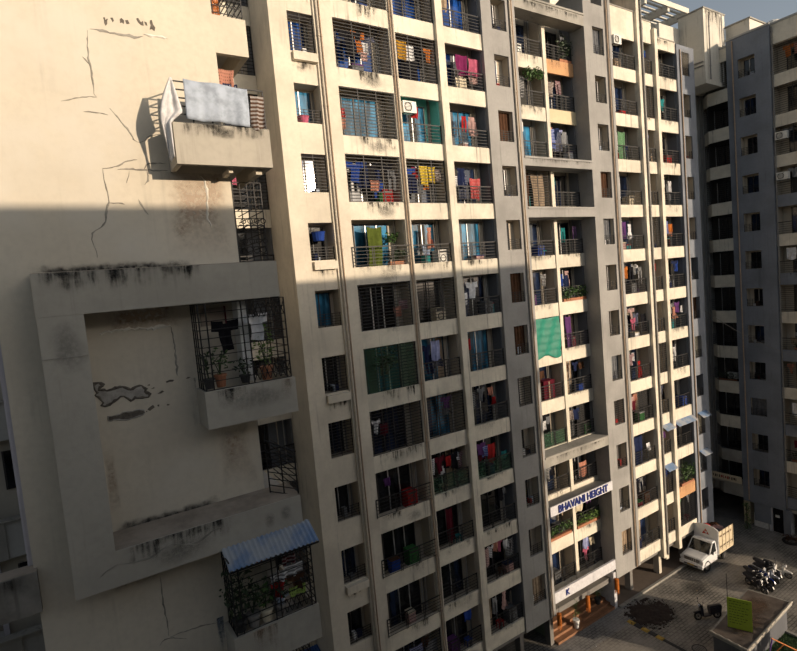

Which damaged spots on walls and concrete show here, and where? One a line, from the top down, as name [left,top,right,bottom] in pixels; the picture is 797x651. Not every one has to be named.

crack [63,29,168,257]
damp [47,263,192,285]
flaking render [93,380,174,421]
crack [160,578,219,645]